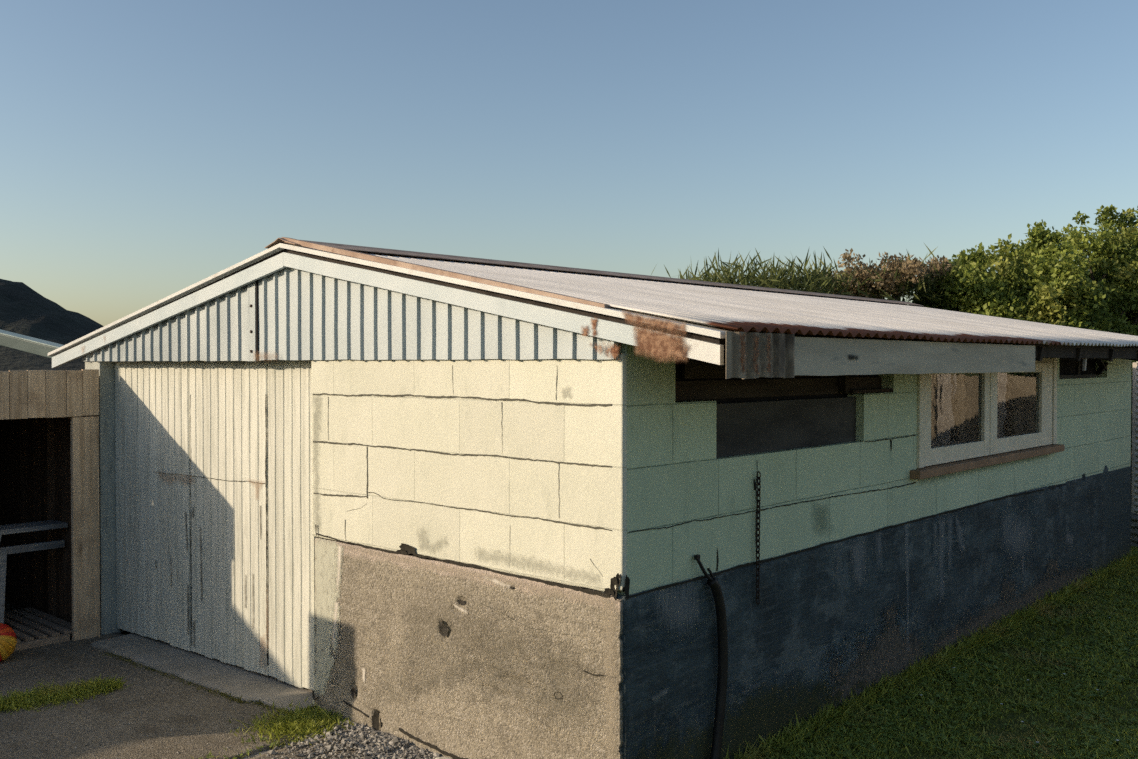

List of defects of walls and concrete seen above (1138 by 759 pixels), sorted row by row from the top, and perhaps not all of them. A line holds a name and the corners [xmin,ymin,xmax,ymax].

rust [582,318,619,358]
rust [624,312,689,360]